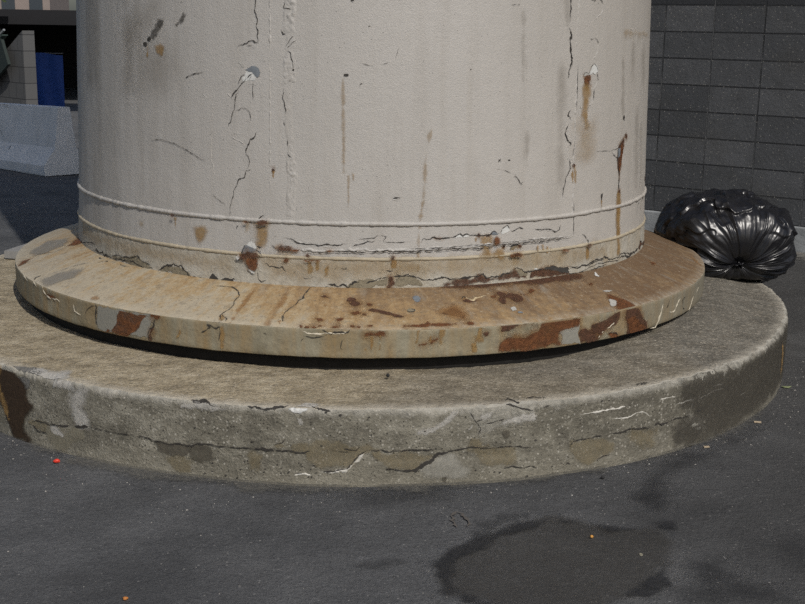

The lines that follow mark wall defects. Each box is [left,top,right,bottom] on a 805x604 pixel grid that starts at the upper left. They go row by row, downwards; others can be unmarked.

crack [565,0,573,75]
corrosion [613,134,627,254]
corrosion [95,304,160,341]
spalling [81,242,237,282]
crack [202,285,240,348]
peeling [236,241,265,282]
crack [266,263,314,320]
crack [287,235,409,247]
corrosion [347,297,488,352]
peeling [422,225,523,240]
spalling [326,241,644,288]
corrosion [499,290,647,351]